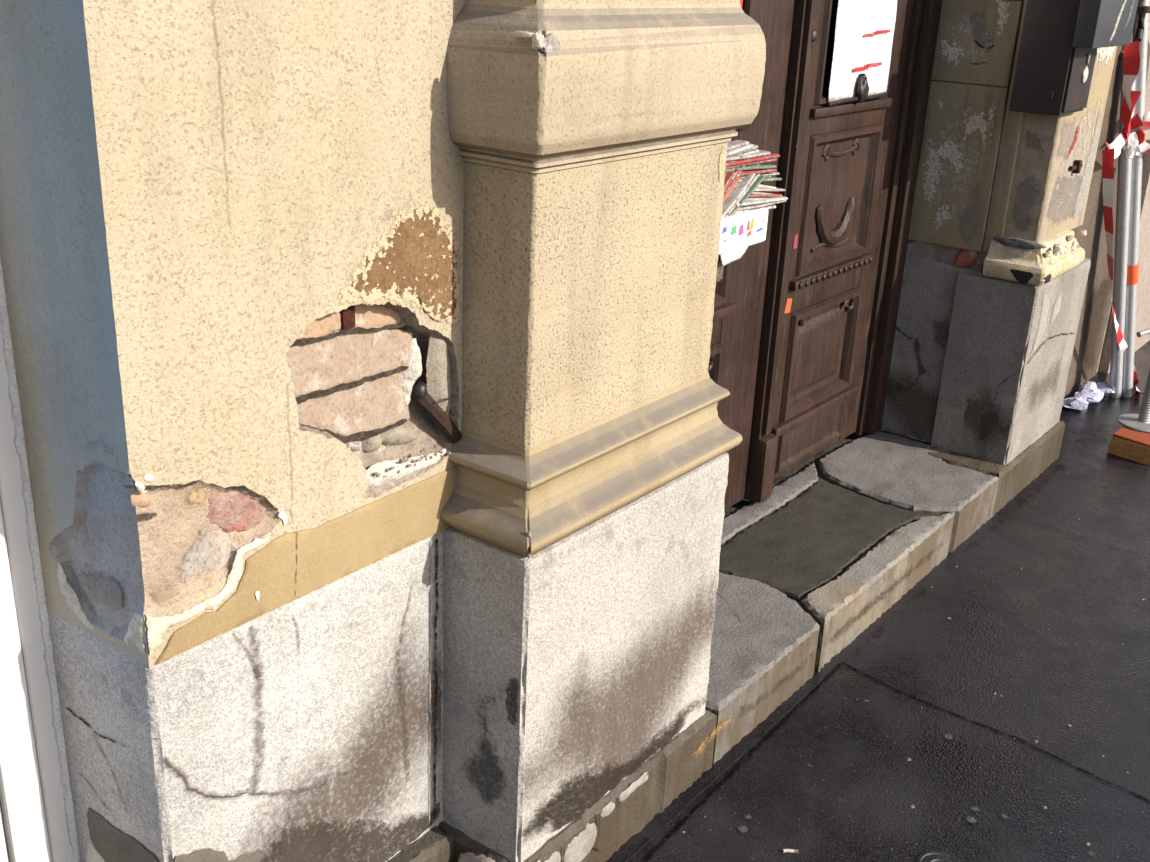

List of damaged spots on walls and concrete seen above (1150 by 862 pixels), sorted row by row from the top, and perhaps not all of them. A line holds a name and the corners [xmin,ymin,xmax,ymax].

spalling [286,194,462,499]
crack [999,333,1075,386]
spalling [48,461,287,656]
crack [165,756,269,798]
damp [248,626,262,793]
damp [257,653,442,862]
crack [429,539,439,823]
spalling [458,852,495,862]
damp [461,698,503,804]
peeling [537,772,648,862]
damp [524,596,716,837]